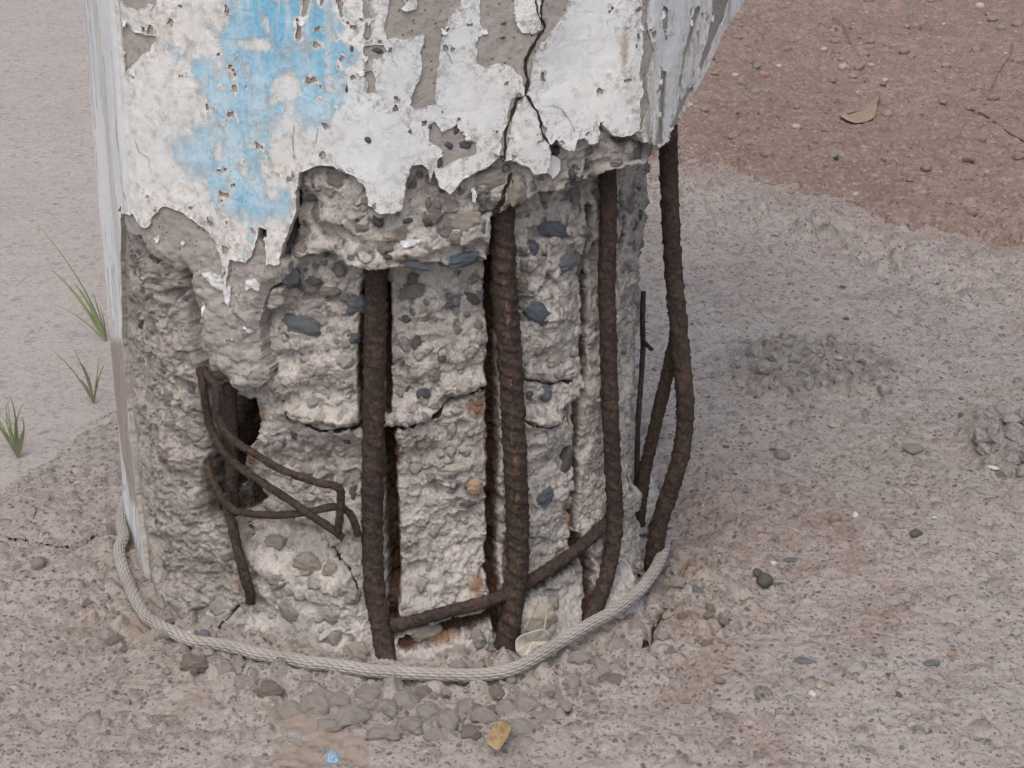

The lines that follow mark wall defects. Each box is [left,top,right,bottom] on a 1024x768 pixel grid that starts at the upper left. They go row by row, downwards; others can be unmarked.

crack [492,0,575,217]
corrosion [237,398,267,509]
corrosion [357,313,365,425]
corrosion [384,281,402,618]
spalling [122,0,727,663]
corrosion [398,254,501,651]
corrosion [531,402,595,618]
corrosion [578,271,586,374]